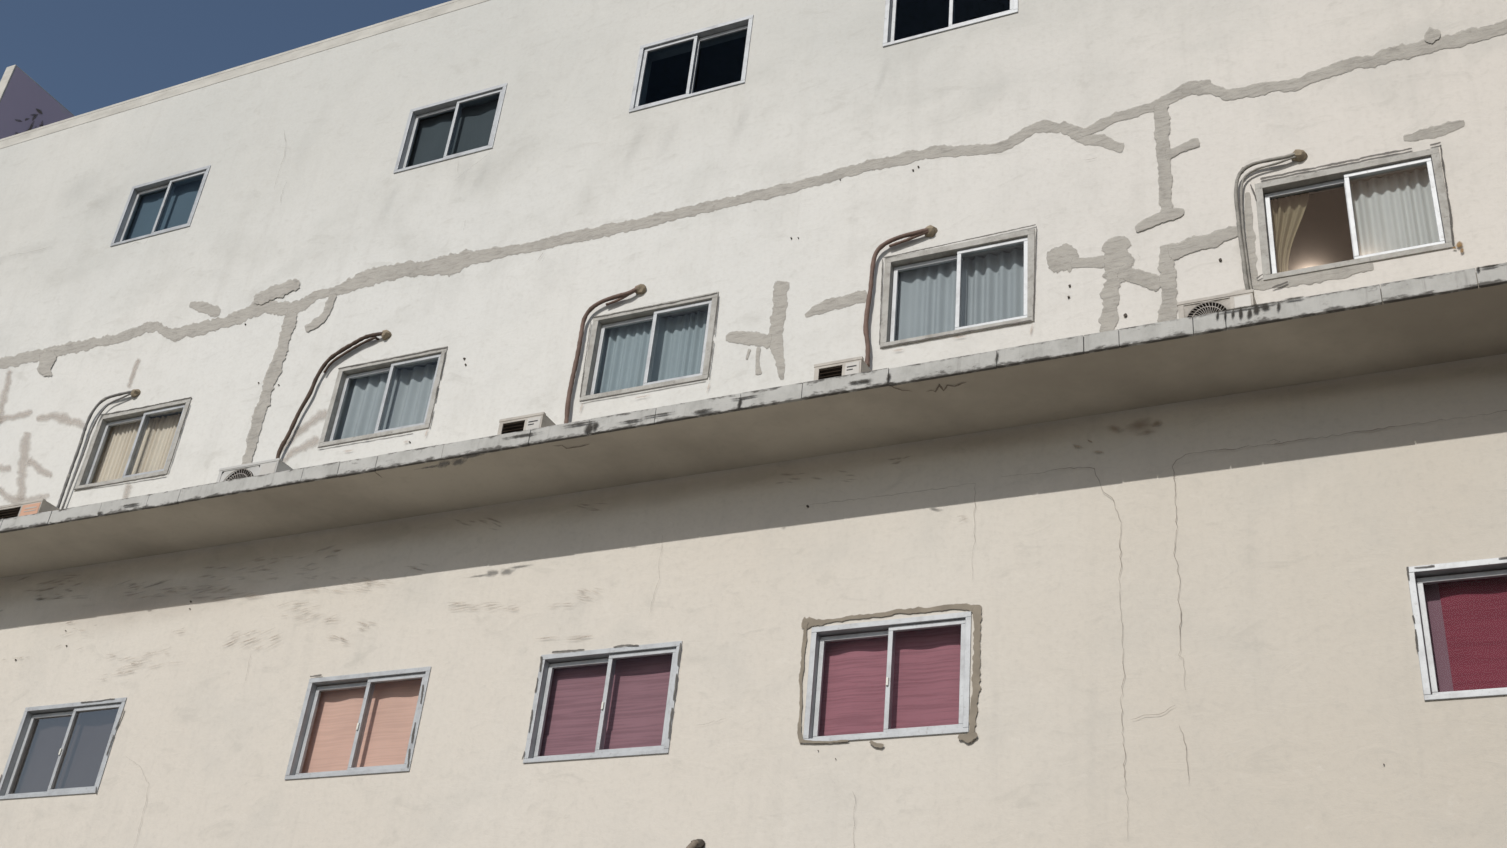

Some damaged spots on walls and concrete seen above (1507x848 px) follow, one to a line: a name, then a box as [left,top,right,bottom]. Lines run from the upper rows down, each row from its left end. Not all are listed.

crack [810,410,1507,837]